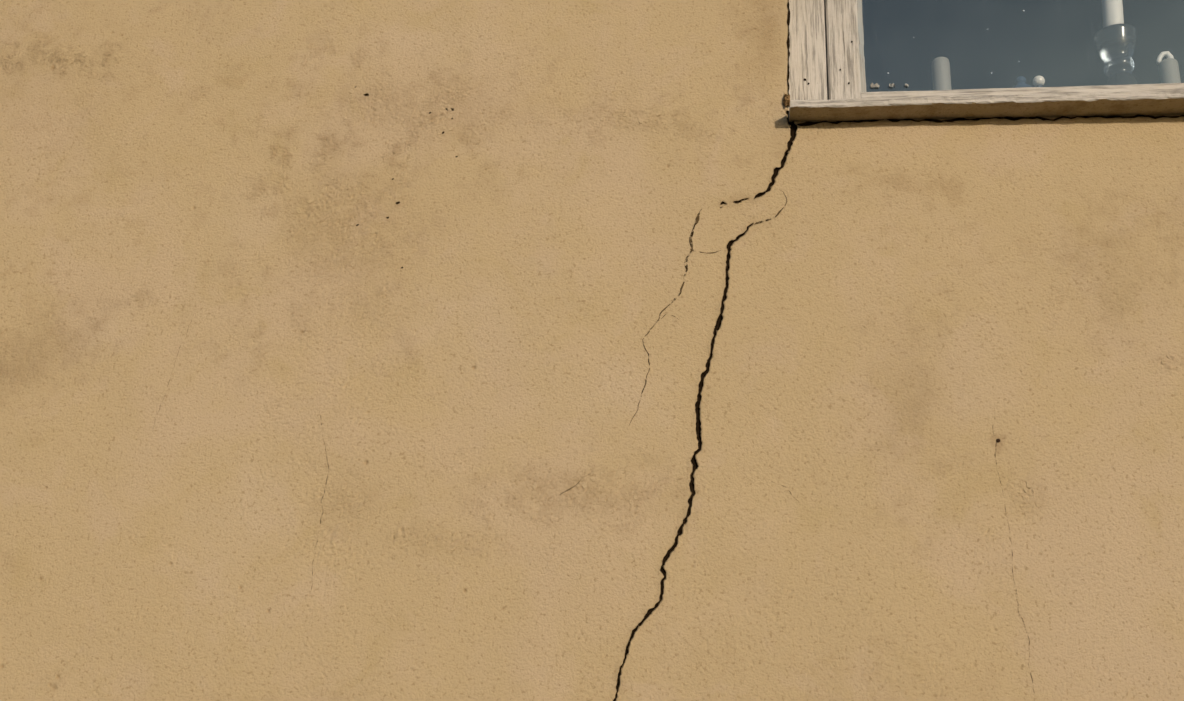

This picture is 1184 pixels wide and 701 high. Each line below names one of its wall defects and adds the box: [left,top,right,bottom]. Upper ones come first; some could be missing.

crack [613,0,1184,701]